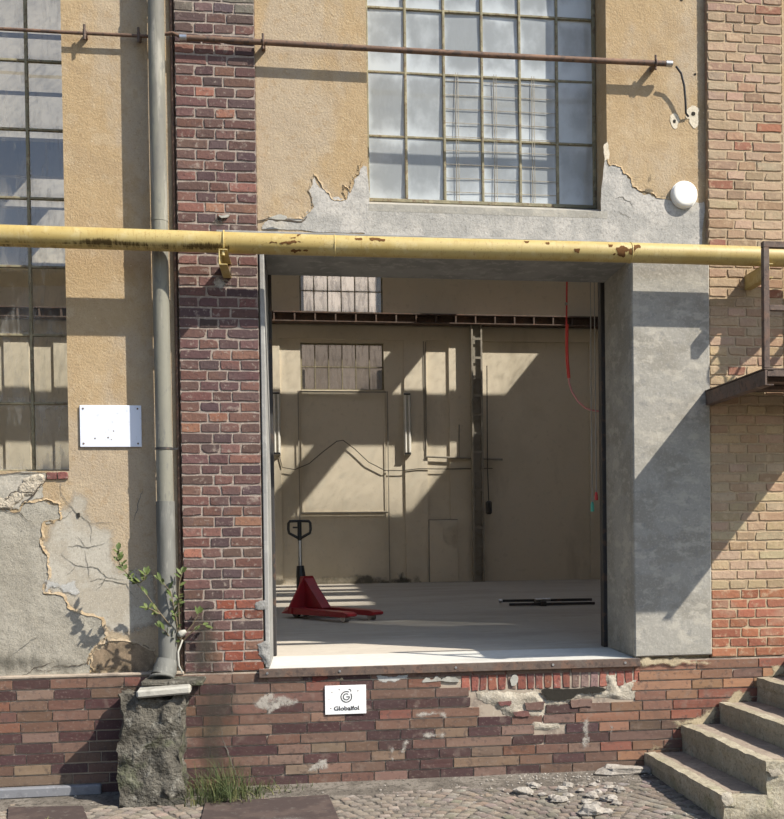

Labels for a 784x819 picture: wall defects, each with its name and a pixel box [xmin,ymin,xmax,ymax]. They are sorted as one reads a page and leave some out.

flaking render [601,142,705,258]
flaking render [0,471,108,676]
spalling [422,668,640,730]